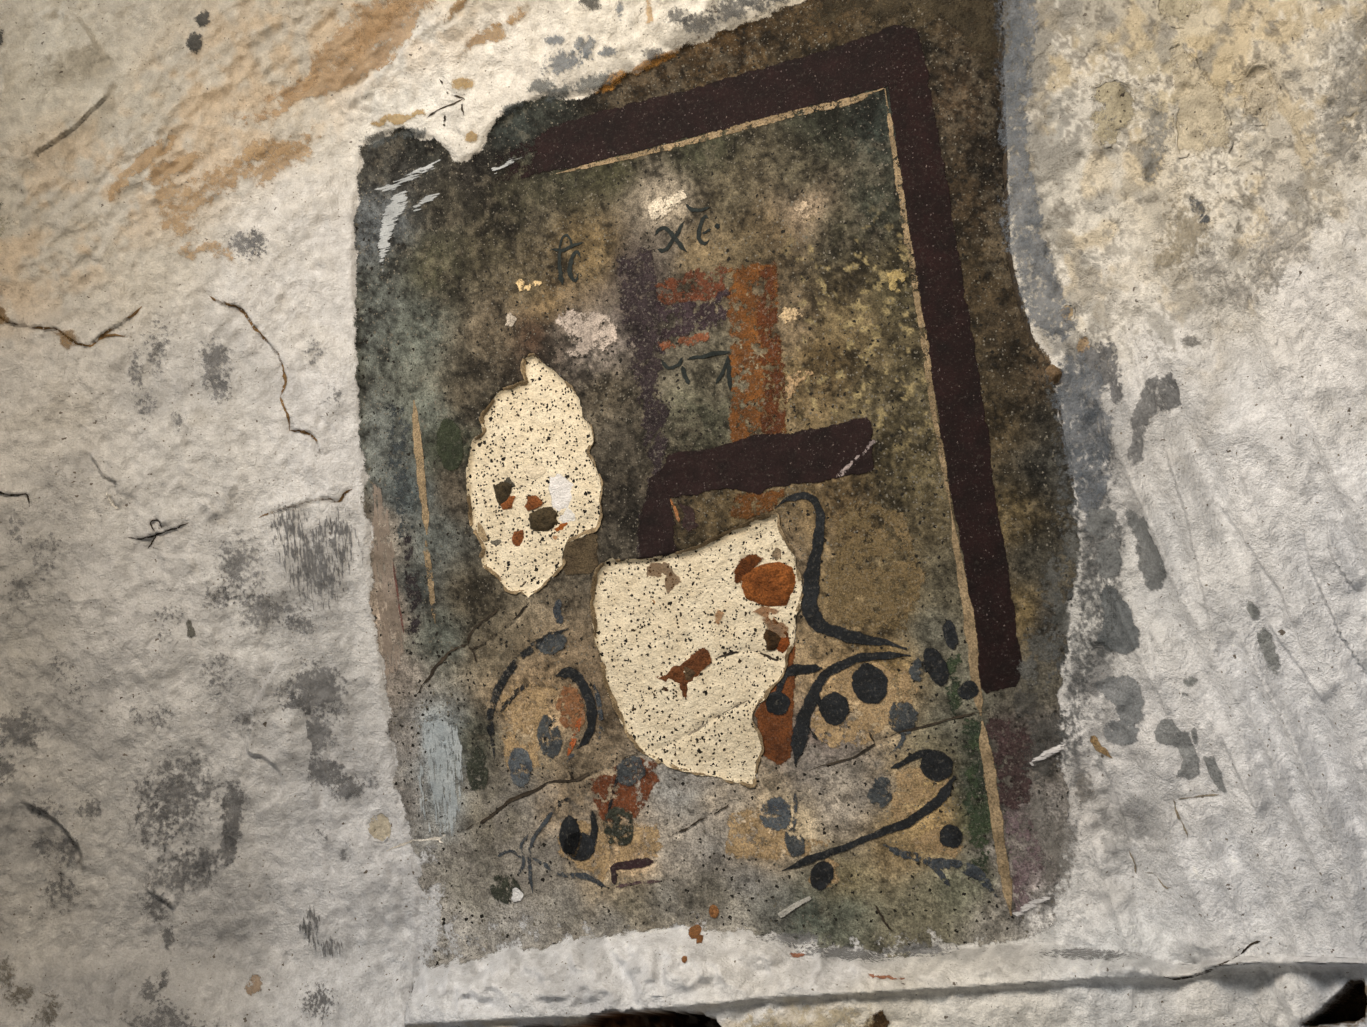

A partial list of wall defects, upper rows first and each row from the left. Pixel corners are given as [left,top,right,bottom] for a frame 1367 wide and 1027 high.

crack [0,306,142,347]
crack [204,290,317,442]
crack [0,492,30,507]
crack [128,520,188,548]
spalling [466,353,804,788]